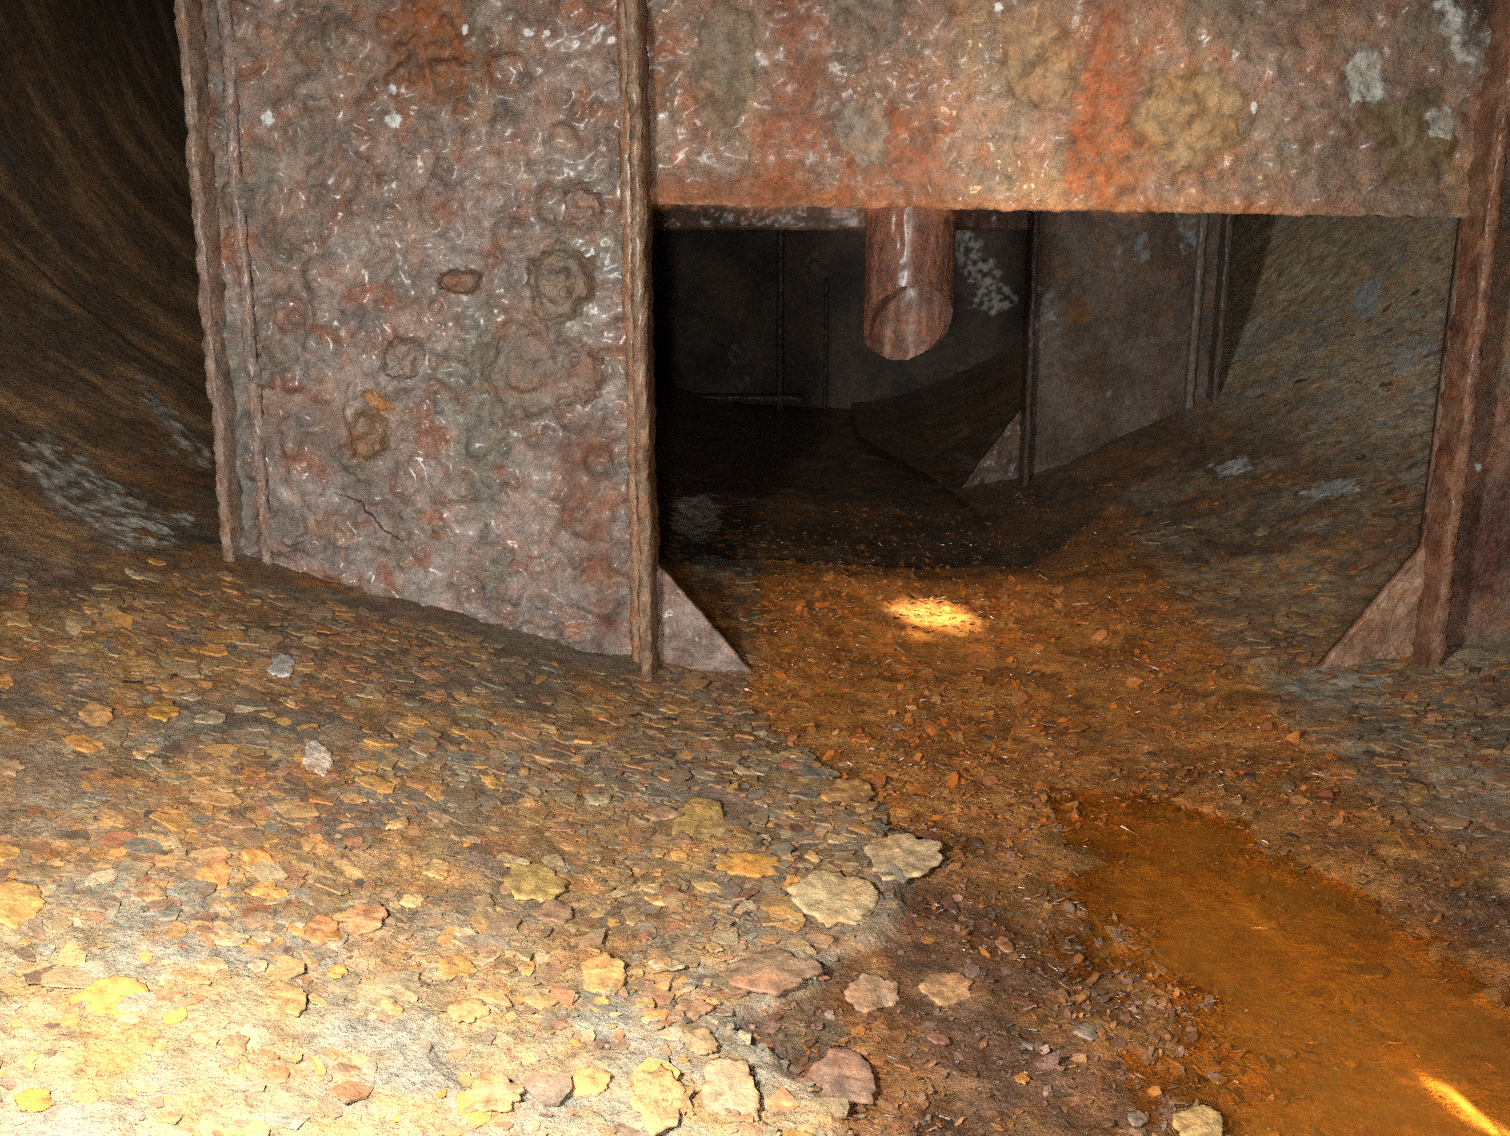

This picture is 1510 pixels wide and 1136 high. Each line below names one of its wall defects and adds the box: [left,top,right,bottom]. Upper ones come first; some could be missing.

corrosion [375,0,465,113]
corrosion [755,0,829,199]
corrosion [1066,6,1138,201]
damp [1433,0,1492,64]
corrosion [437,266,483,295]
corrosion [465,181,608,428]
corrosion [0,289,1510,1136]